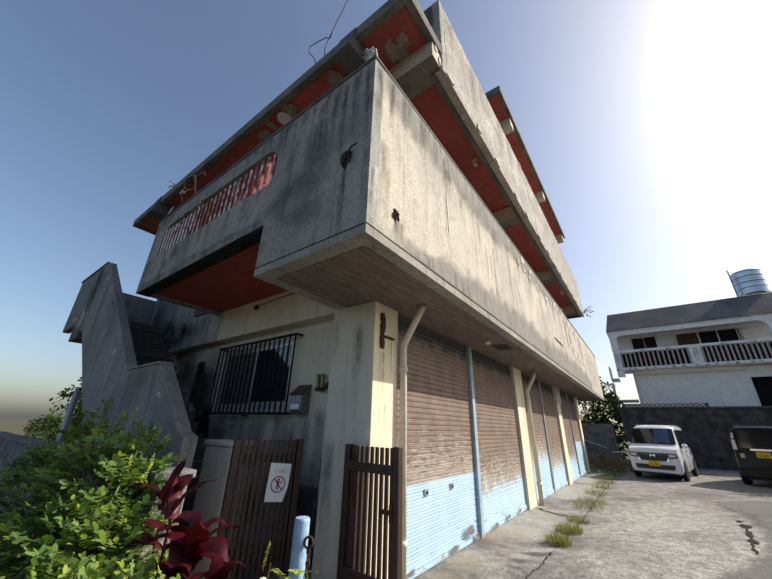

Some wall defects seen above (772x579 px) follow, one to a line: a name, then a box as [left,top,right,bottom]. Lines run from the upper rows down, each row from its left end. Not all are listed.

peeling [385,32,409,63]
crack [506,482,611,579]